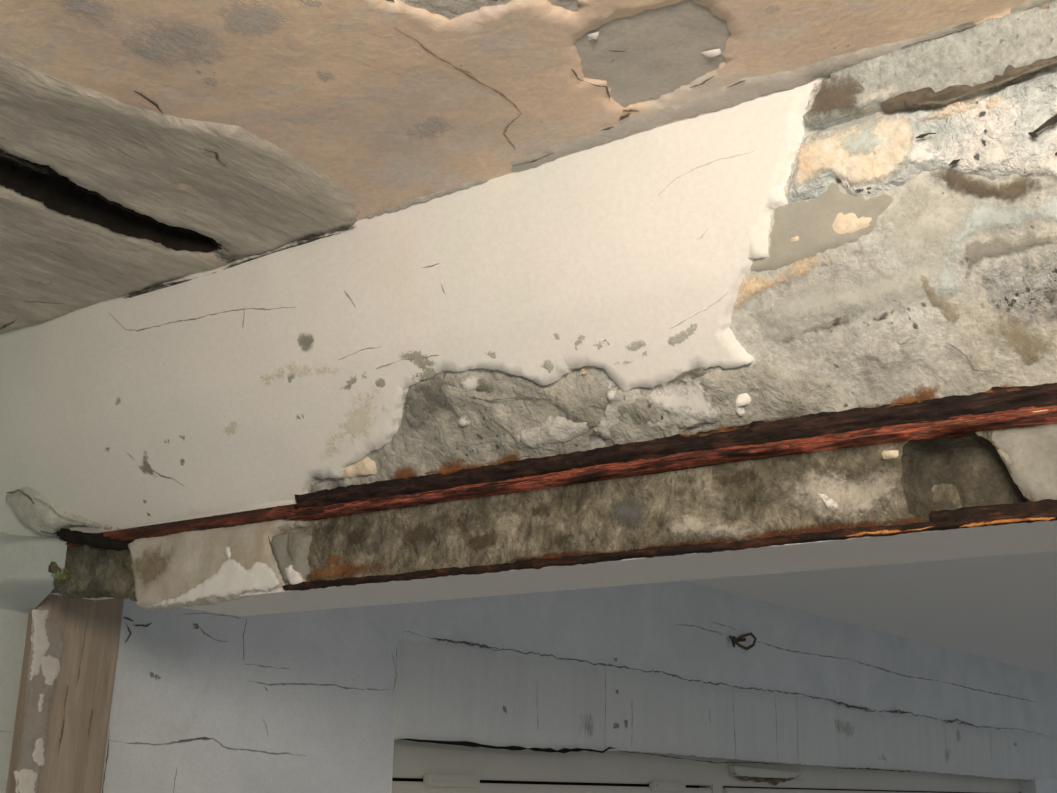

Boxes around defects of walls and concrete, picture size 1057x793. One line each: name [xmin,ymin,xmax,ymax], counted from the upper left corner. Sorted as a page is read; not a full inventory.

crack [395,28,522,149]
spalling [308,0,1057,493]
rust [876,386,940,407]
spalling [48,519,317,610]
rust [394,451,530,479]
water stain [469,533,497,549]
rust [647,518,934,548]
spalling [882,432,1034,522]
rust [961,517,1054,527]
peeling [14,609,64,793]
crack [180,613,1042,765]
crack [109,720,306,793]